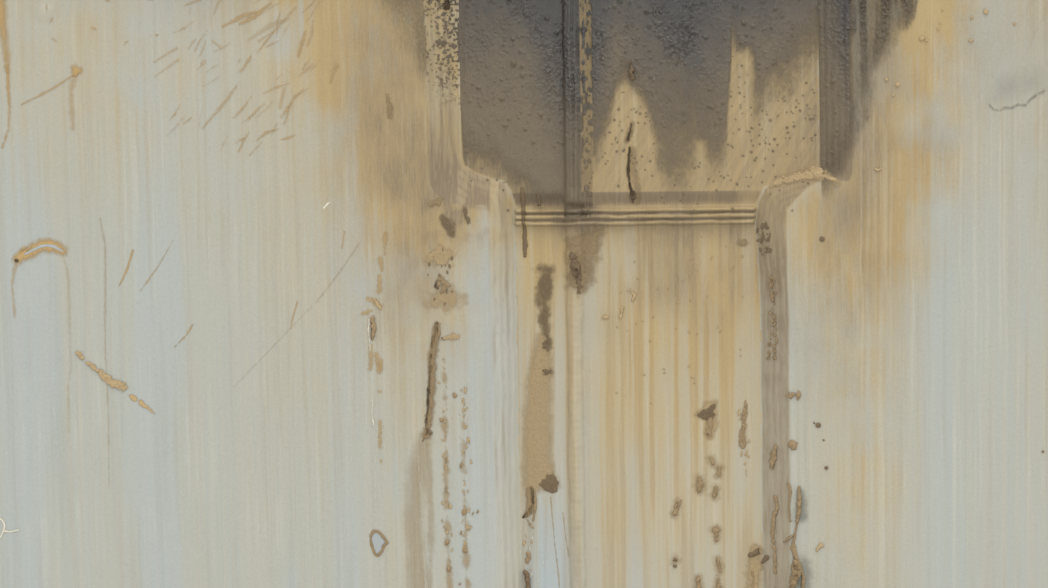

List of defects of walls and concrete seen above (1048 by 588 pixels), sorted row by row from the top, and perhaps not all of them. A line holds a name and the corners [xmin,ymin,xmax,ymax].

water stain [459,0,917,257]
spalling [14,244,63,262]
peeling [75,351,155,414]
crack [422,323,440,441]